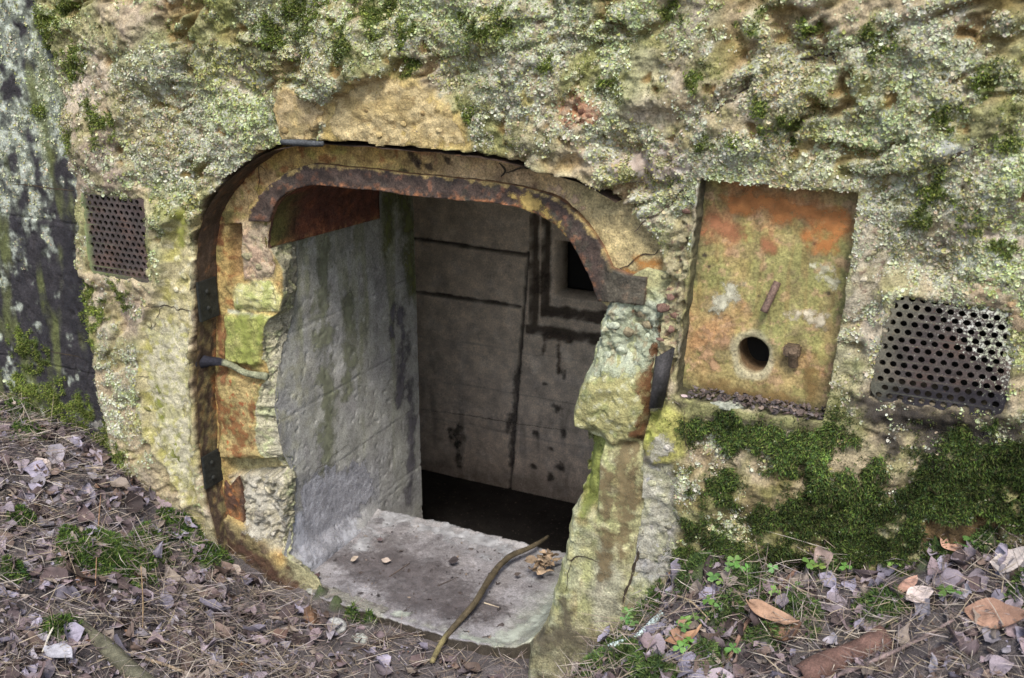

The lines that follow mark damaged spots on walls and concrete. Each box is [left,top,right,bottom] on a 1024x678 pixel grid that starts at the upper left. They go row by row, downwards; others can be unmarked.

corrosion [701,185,850,254]
corrosion [215,305,255,459]
leakage [294,303,600,657]
corrosion [595,326,661,582]